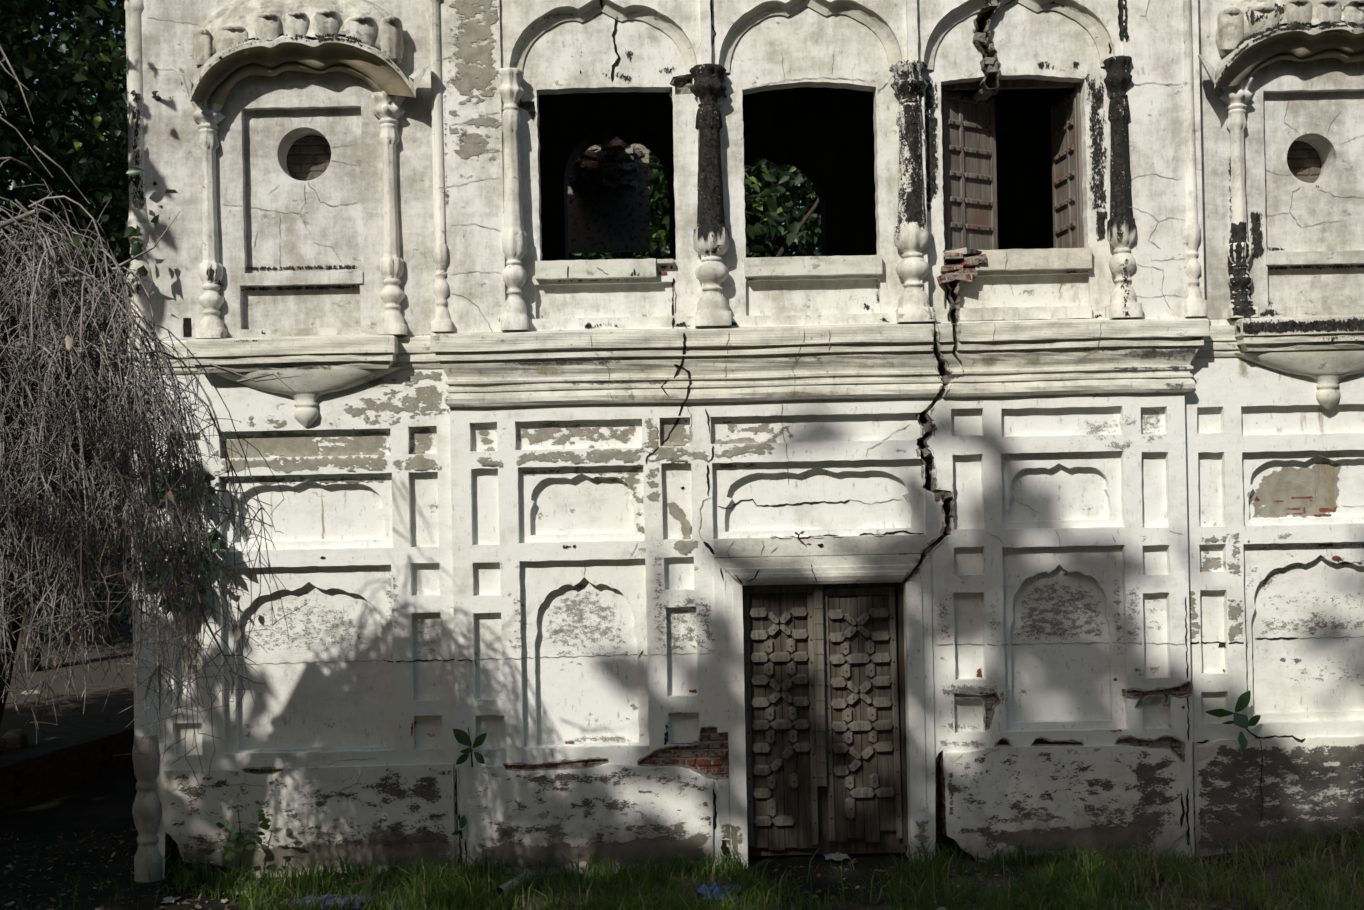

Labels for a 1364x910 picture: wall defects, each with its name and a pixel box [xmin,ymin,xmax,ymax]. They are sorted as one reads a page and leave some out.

peeling [448,0,502,167]
crack [600,0,620,81]
leakage [897,68,938,230]
crack [972,0,1015,102]
leakage [1070,61,1127,244]
leakage [1119,0,1129,42]
leakage [1227,158,1364,341]
peeling [213,371,452,488]
crack [567,266,960,584]
spalling [1247,462,1341,518]
spalling [475,713,729,864]
peeling [935,667,1364,860]